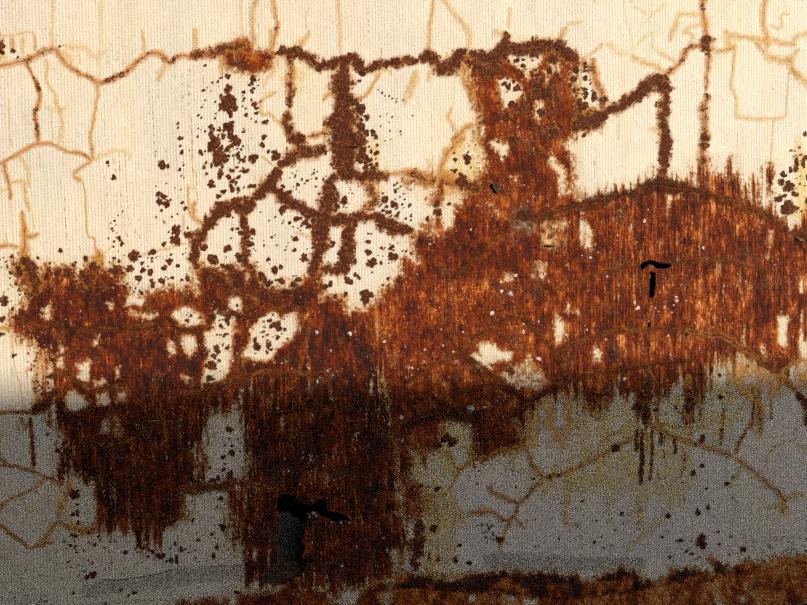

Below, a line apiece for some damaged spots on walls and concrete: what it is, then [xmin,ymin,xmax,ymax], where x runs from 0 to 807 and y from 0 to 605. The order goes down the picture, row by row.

crack [0,0,807,358]
corrosion [401,173,428,189]
corrosion [424,165,461,210]
corrosion [635,166,662,191]
corrosion [793,142,807,234]
crack [180,319,333,397]
crack [0,349,128,549]
corrosion [553,368,646,439]
crack [403,311,807,549]
corrosion [627,425,655,485]
crack [139,477,278,527]
corrosion [175,596,232,605]